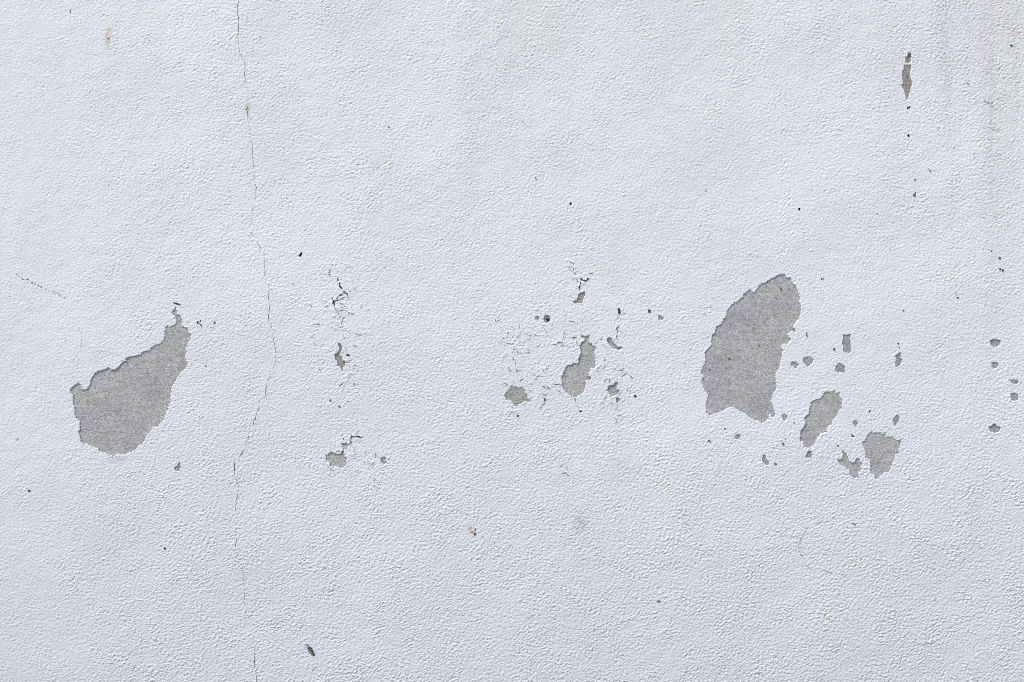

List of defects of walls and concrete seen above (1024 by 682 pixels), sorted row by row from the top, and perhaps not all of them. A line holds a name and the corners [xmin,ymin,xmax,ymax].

peeling [902,53,912,99]
peeling [71,308,191,456]
peeling [326,443,349,468]
peeling [335,343,345,371]
peeling [504,385,532,407]
peeling [561,336,596,397]
peeling [701,275,813,423]
peeling [800,391,842,458]
peeling [838,415,902,479]